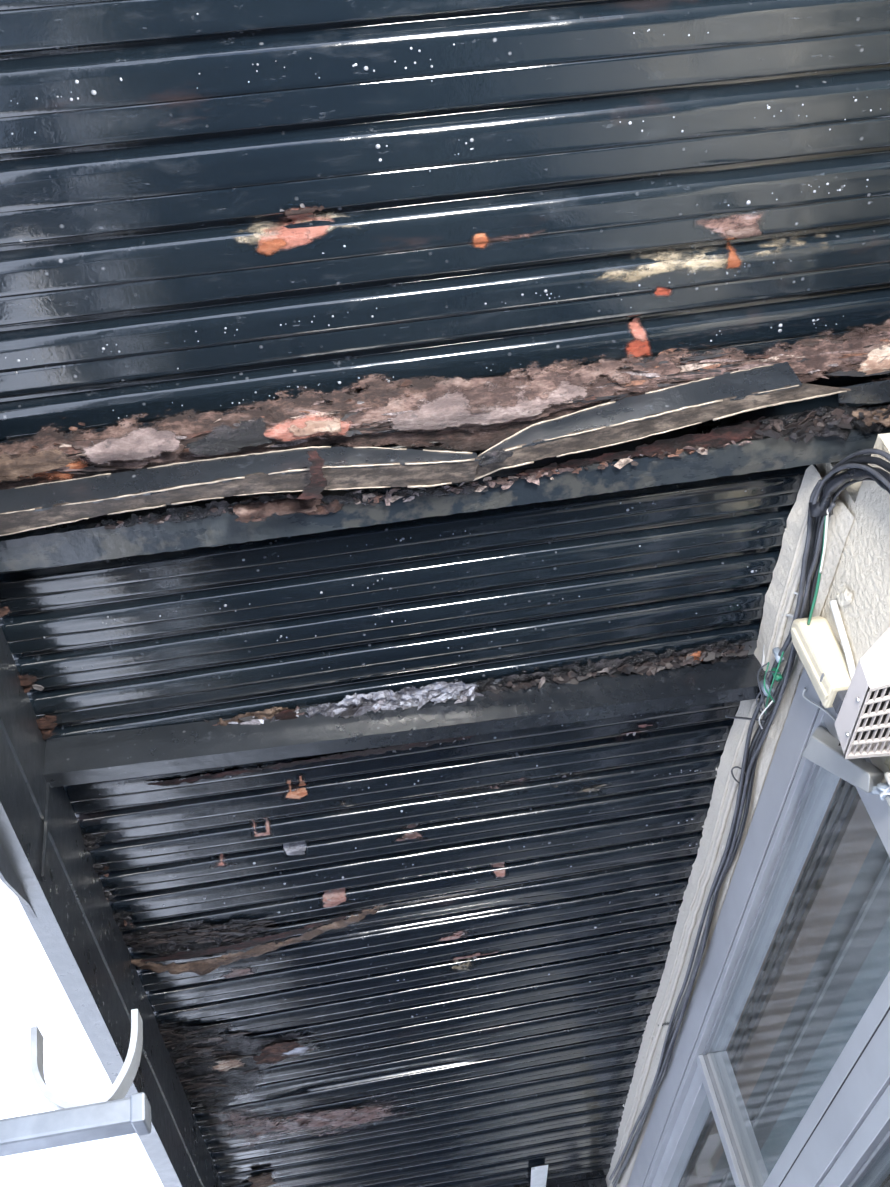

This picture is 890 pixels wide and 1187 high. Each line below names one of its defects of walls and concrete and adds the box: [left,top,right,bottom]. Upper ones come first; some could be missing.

rust [237,203,347,255]
rust [473,233,535,248]
rust [626,318,650,357]
peeling [324,643,752,719]
rust [286,776,307,799]
rust [223,968,254,978]